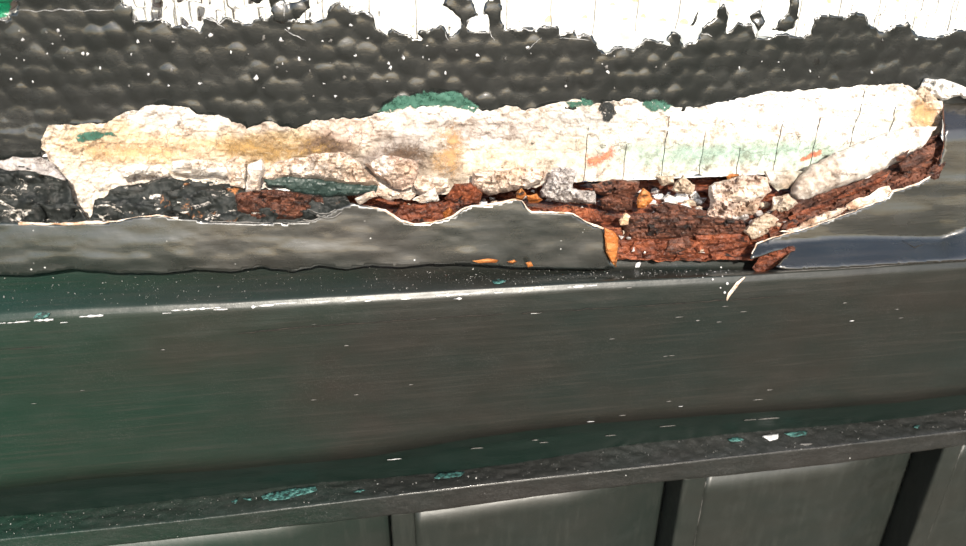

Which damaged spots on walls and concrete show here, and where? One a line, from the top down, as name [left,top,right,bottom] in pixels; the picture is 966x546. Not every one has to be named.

peeling [0,0,966,181]
corrosion [436,132,463,171]
corrosion [586,146,613,168]
corrosion [767,100,945,238]
peeling [0,174,891,275]
corrosion [752,246,795,272]
spalling [435,279,506,300]